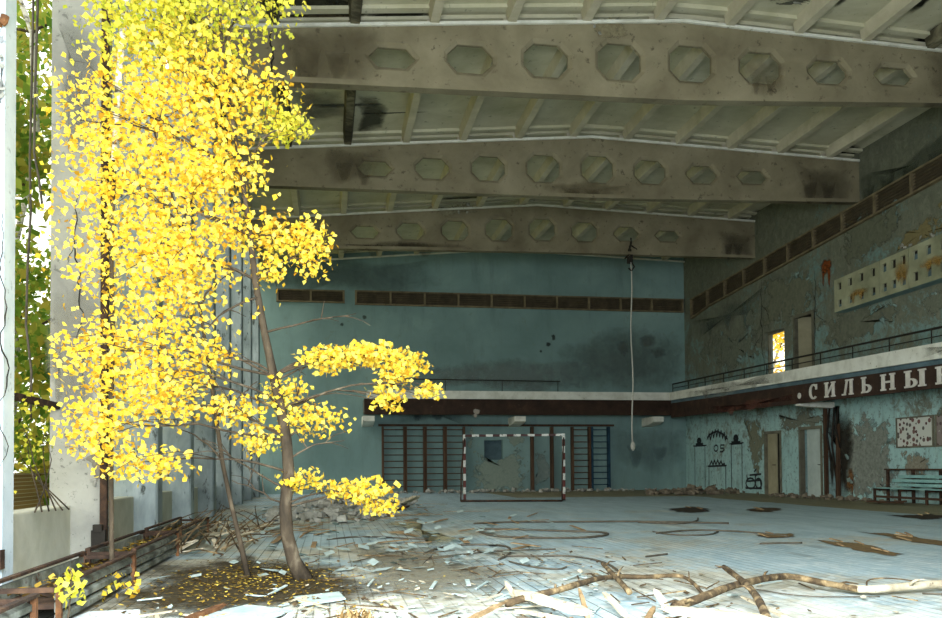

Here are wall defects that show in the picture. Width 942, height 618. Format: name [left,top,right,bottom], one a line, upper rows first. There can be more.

leakage [303,95,406,131]
peeling [744,419,764,474]
peeling [845,412,930,499]